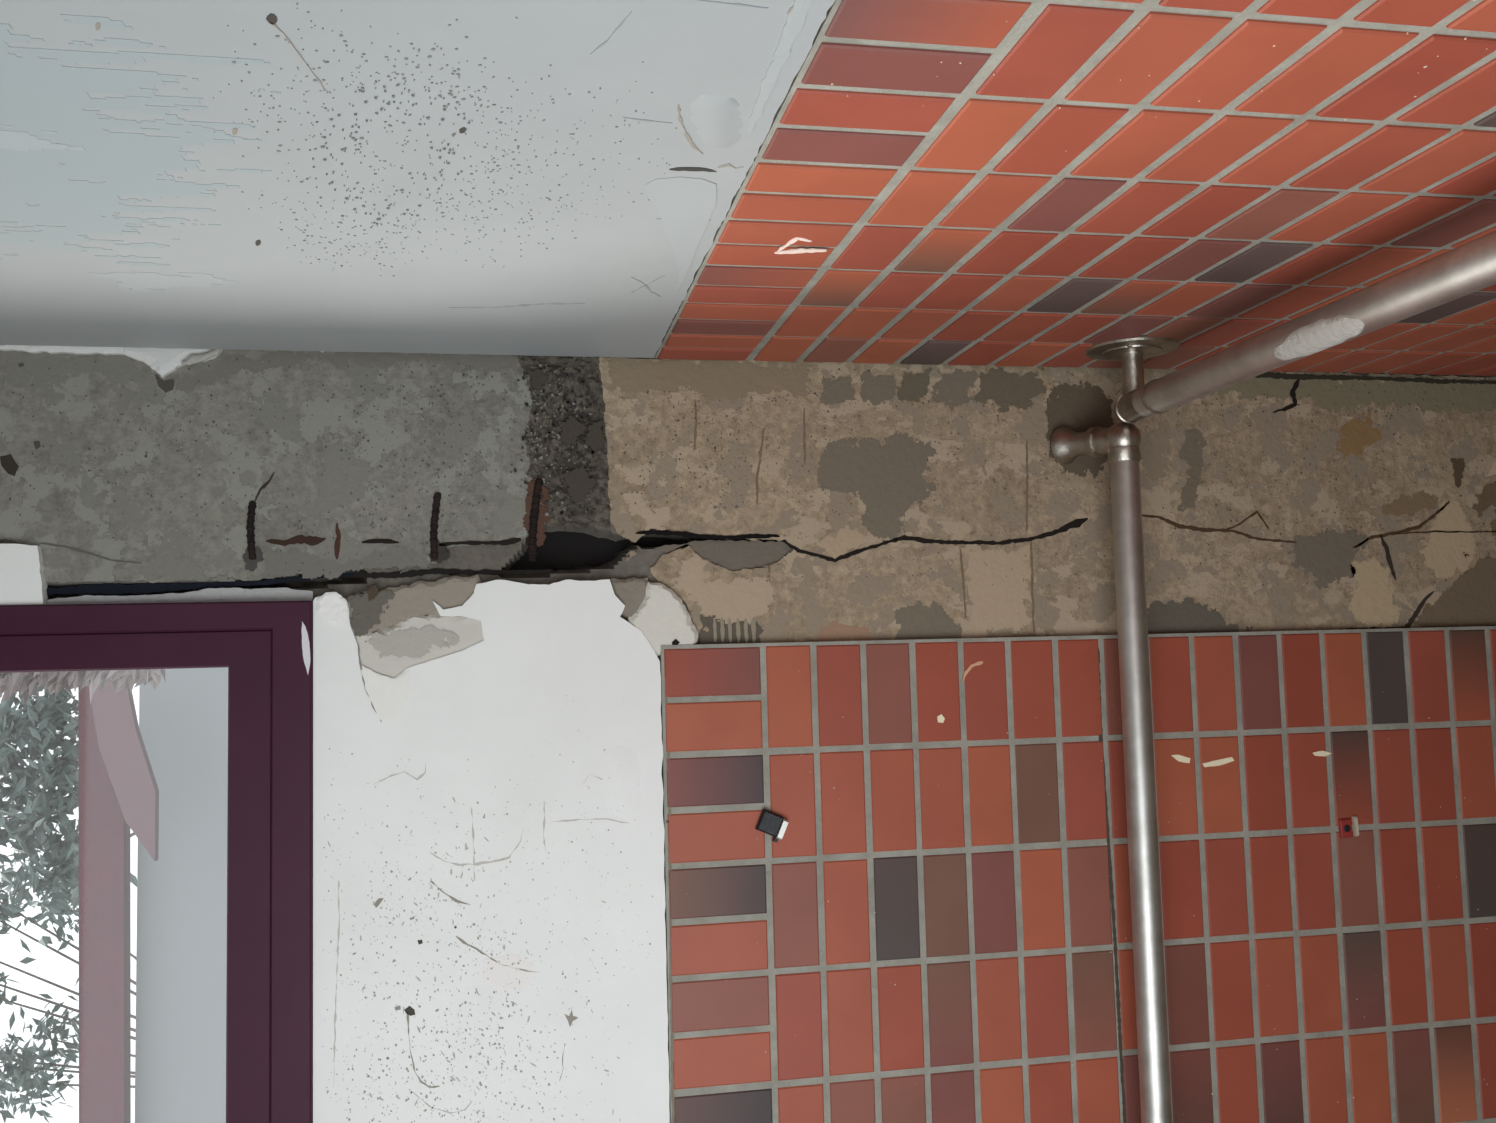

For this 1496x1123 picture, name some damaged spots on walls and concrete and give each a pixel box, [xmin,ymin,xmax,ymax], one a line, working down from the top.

corrosion [242,523,341,571]
crack [39,538,553,722]
corrosion [523,477,551,547]
peeling [0,345,1123,722]
crack [1142,510,1296,543]
peeling [1113,369,1496,632]
crack [1337,502,1496,630]